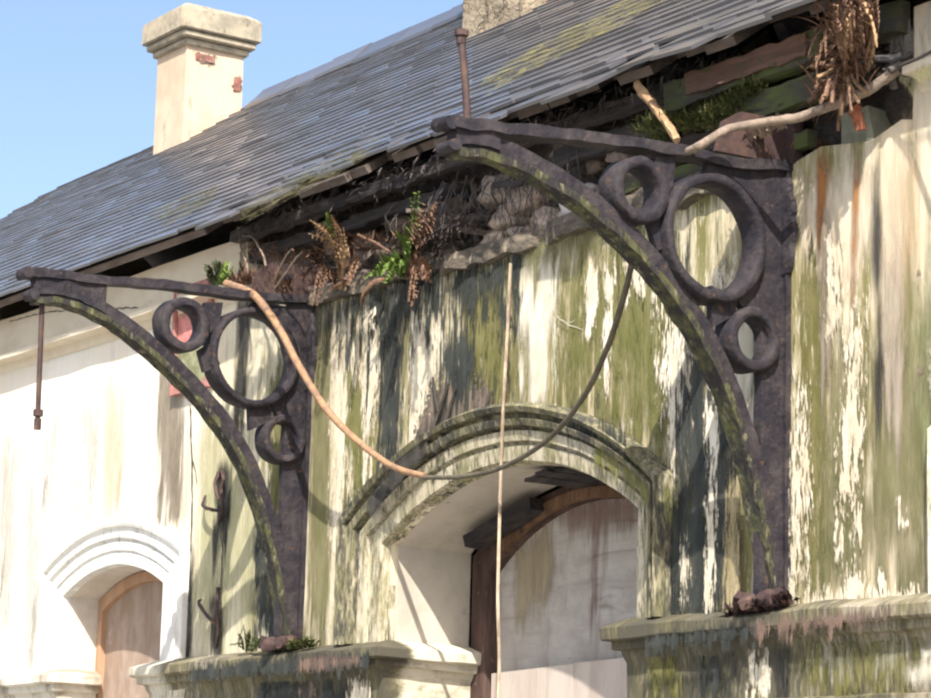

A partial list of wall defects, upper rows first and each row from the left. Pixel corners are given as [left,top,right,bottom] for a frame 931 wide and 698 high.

spalling [193,50,217,67]
spalling [231,76,242,92]
crack [461,0,505,33]
damp [157,373,184,526]
peeling [325,297,382,645]
damp [313,231,602,517]
peeling [518,252,560,403]
damp [550,341,743,615]
damp [645,475,887,698]
rust [816,157,828,252]
damp [801,159,903,455]
peeling [787,227,920,604]